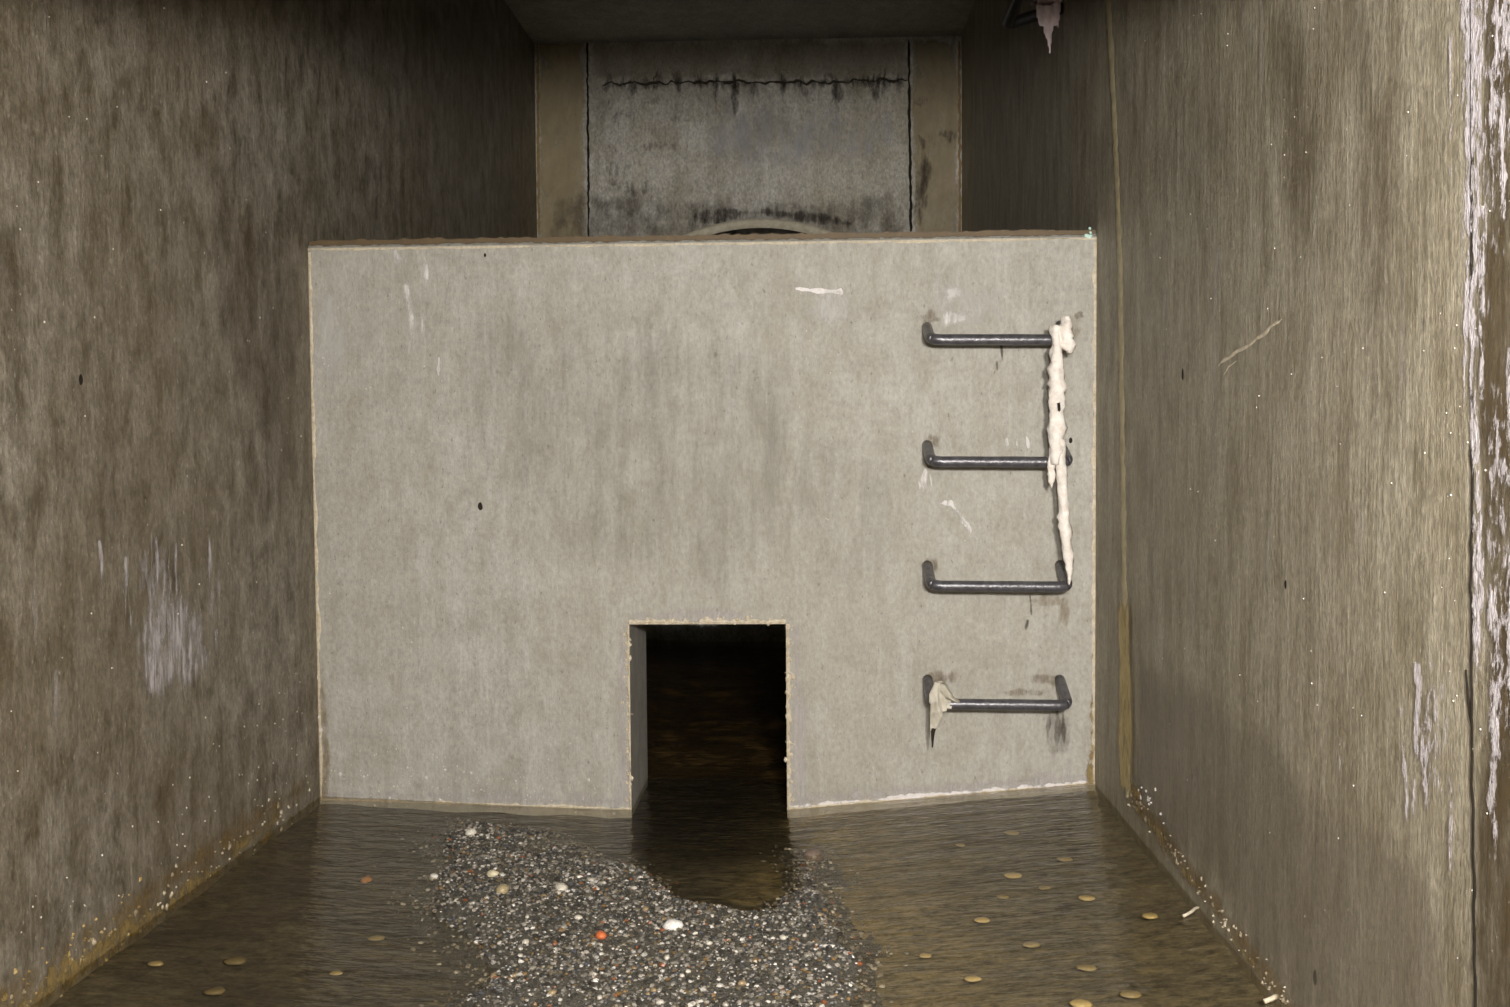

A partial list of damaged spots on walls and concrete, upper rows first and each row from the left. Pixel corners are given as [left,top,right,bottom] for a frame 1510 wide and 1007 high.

damp [1449,0,1510,1007]